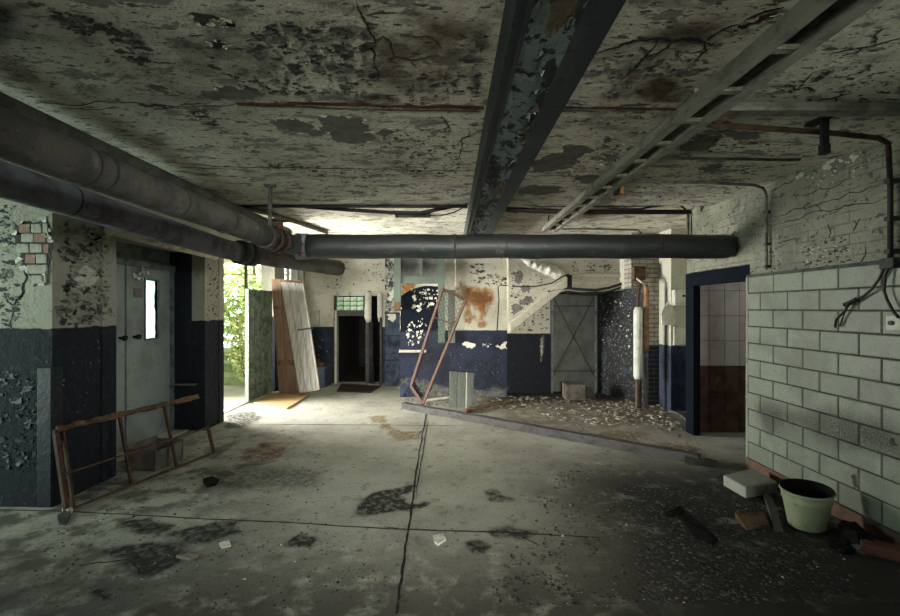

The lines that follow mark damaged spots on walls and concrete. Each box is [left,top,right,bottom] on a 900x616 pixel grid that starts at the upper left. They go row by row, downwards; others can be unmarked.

crack [596,7,784,80]
crack [36,3,484,171]
leakage [637,77,687,102]
peeling [517,184,565,195]
crack [772,179,886,262]
peeling [0,205,115,328]
peeling [324,261,438,346]
rust [455,286,493,327]
peeling [0,370,37,470]
crack [0,414,600,613]